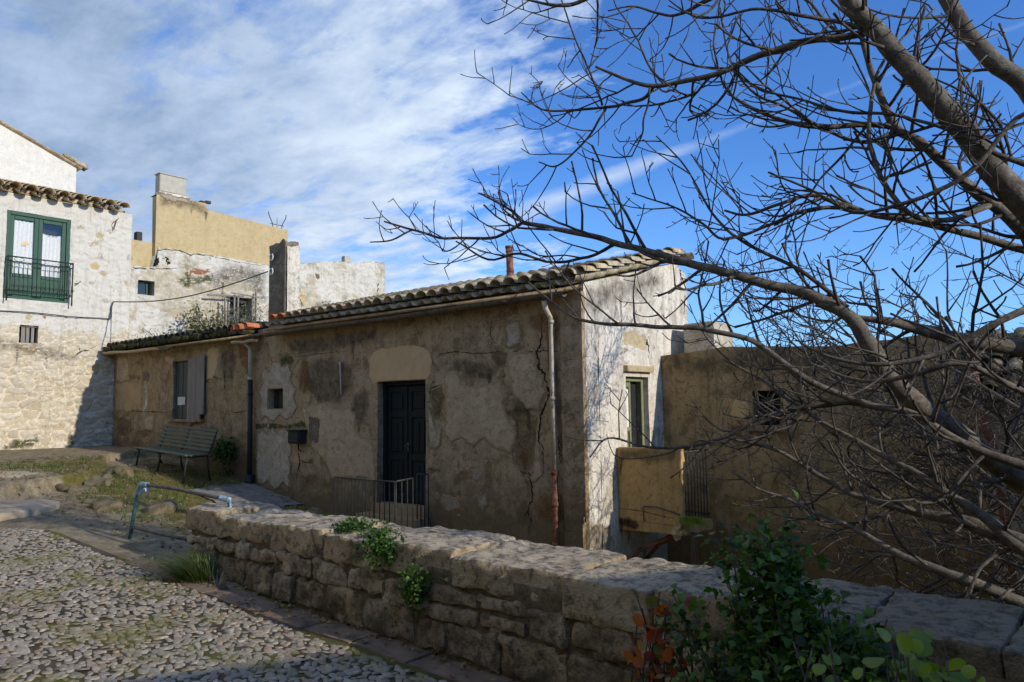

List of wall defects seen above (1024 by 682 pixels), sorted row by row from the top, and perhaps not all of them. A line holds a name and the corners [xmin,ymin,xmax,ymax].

flaking render [88,230,116,285]
flaking render [91,356,150,383]
flaking render [426,319,548,484]
crack [438,320,561,528]
rust [551,470,560,546]